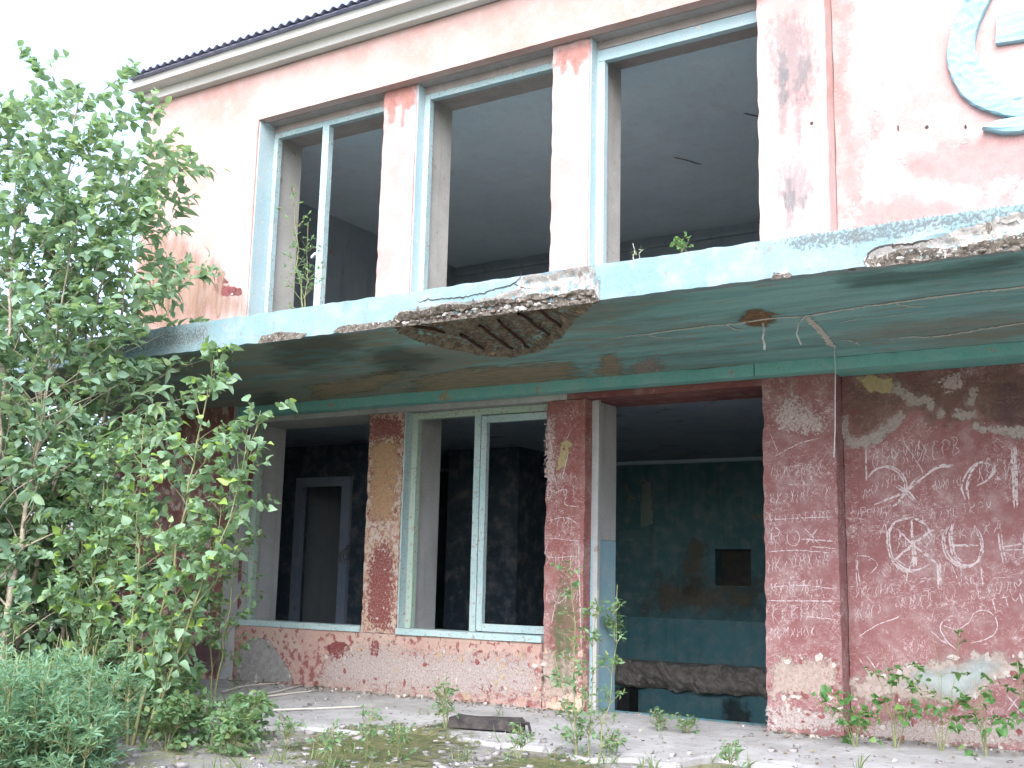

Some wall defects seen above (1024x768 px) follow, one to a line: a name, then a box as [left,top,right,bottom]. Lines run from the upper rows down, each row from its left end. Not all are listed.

spalling [848,212,1024,271]
peeling [214,277,242,296]
crack [417,272,532,302]
spalling [333,266,664,394]
rust [741,309,780,327]
crack [609,286,1024,347]
peeling [856,374,895,394]
peeling [937,373,965,393]
peeling [367,415,404,526]
peeling [314,540,582,705]
peeling [766,650,1024,748]